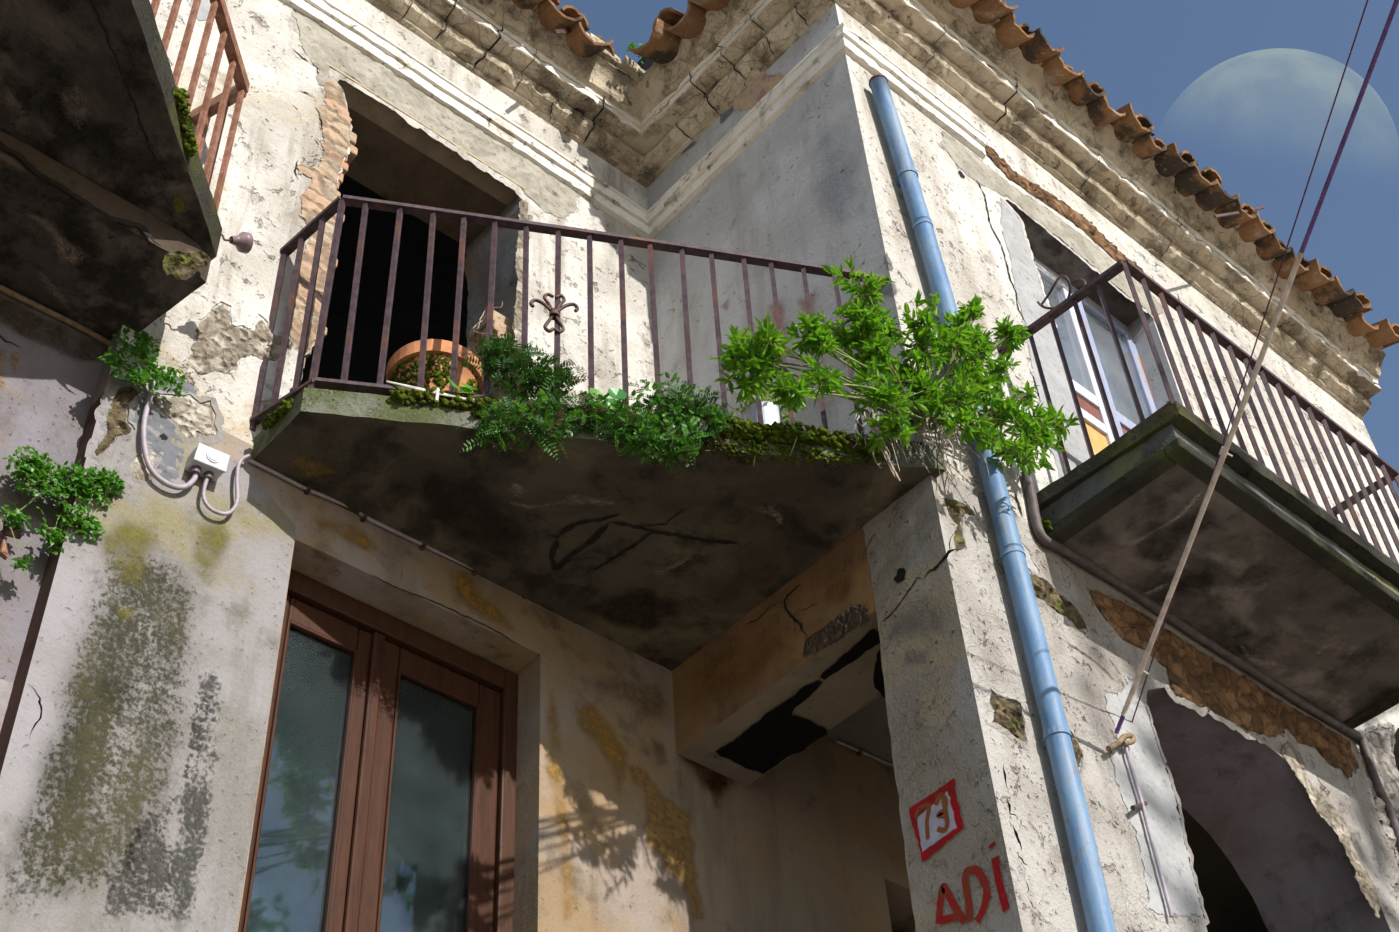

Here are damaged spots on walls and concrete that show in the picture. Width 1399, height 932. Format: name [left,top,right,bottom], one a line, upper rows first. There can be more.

crack [472,26,503,70]
crack [583,96,606,143]
crack [993,82,1018,126]
spalling [85,4,586,485]
leakage [0,299,108,359]
mould [198,527,227,565]
crack [547,508,756,571]
crack [882,532,957,622]
spalling [804,604,870,657]
crack [30,686,42,735]
mould [4,526,221,920]
spalling [1028,568,1399,917]